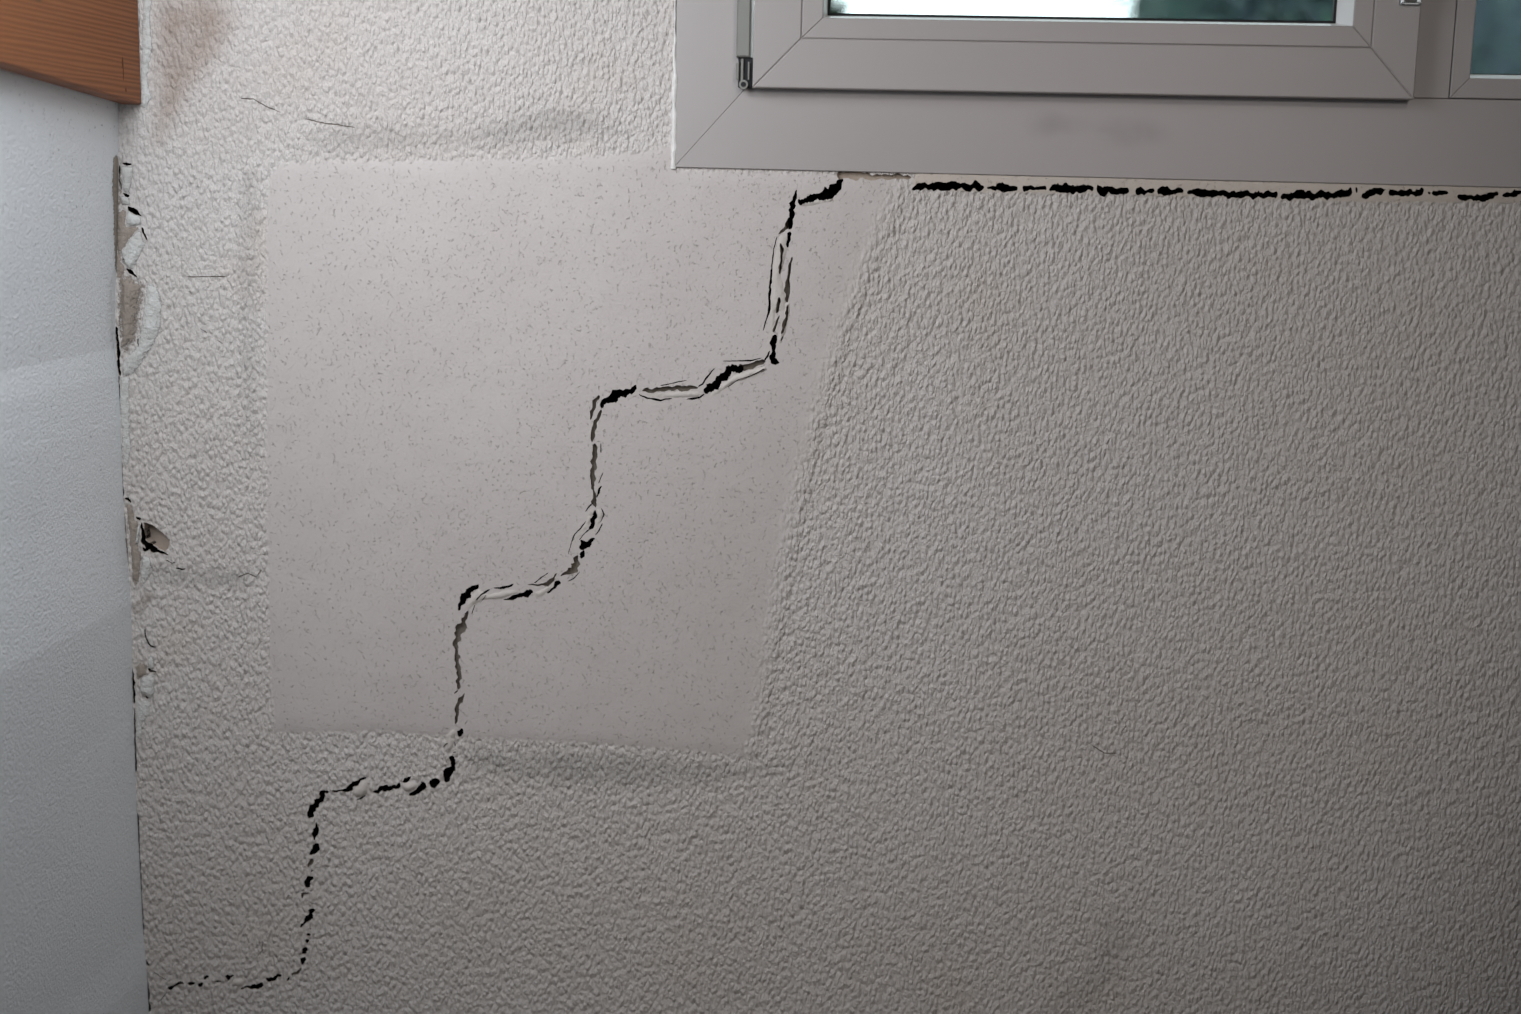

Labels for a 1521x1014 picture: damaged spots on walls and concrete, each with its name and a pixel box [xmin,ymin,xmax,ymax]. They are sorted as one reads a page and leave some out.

flaking render [112,155,147,278]
crack [114,327,122,399]
flaking render [124,497,185,586]
crack [137,171,1521,1011]
crack [130,668,138,772]
flaking render [132,630,157,738]